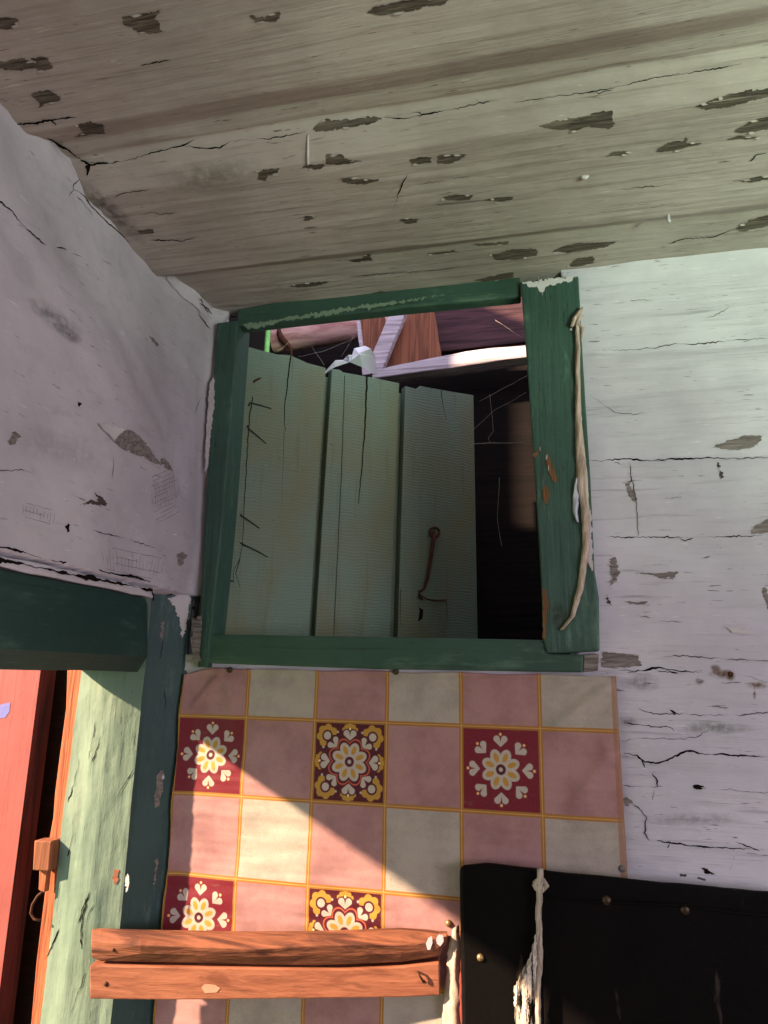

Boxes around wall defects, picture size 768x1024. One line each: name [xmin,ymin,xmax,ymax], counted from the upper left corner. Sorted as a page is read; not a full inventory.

crack [522,64,739,102]
peeling [313,116,382,132]
peeling [540,110,615,133]
crack [17,117,300,242]
peeling [115,428,173,471]
peeling [713,435,762,450]
crack [589,457,768,541]
crack [624,709,768,867]